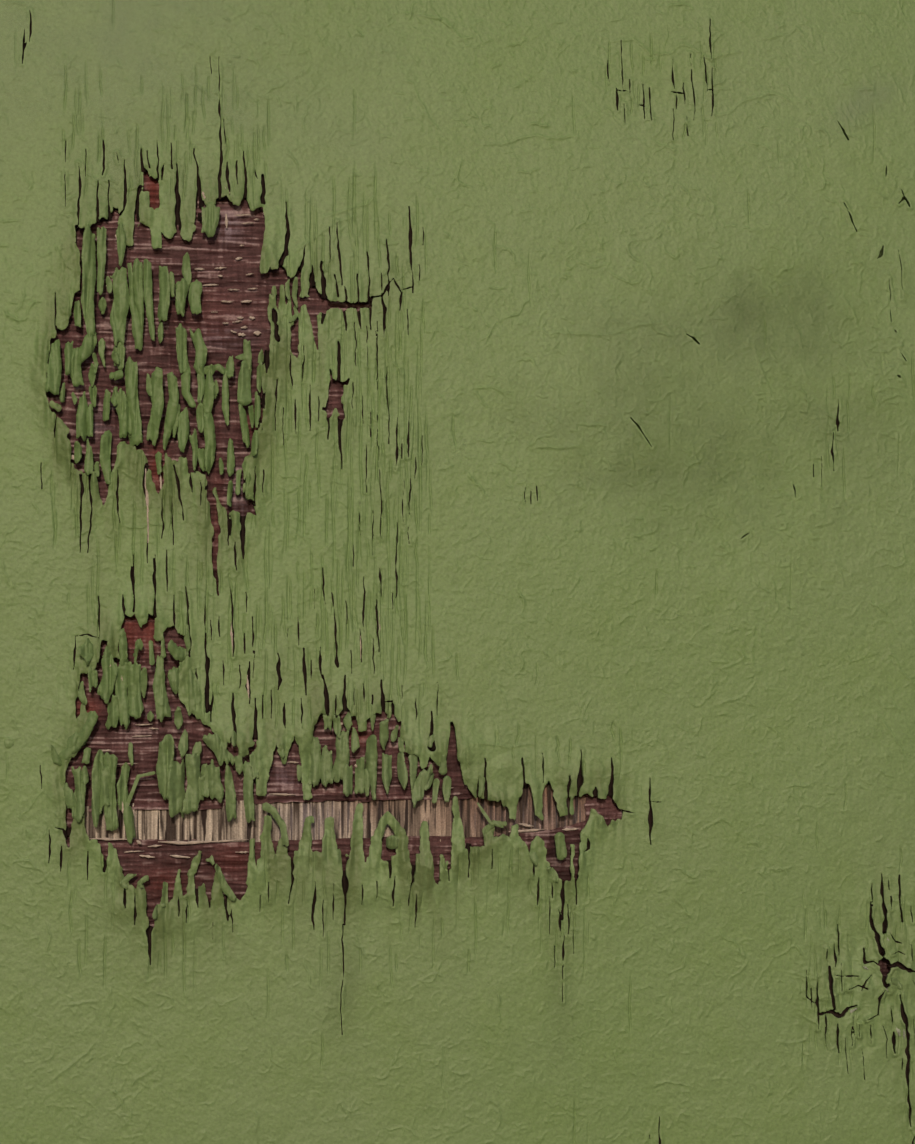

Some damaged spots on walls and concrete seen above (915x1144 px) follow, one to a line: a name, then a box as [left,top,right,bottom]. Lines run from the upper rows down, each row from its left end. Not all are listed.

crack [607,25,714,137]
peeling [40,64,633,1034]
crack [648,781,659,844]
crack [806,874,915,1144]